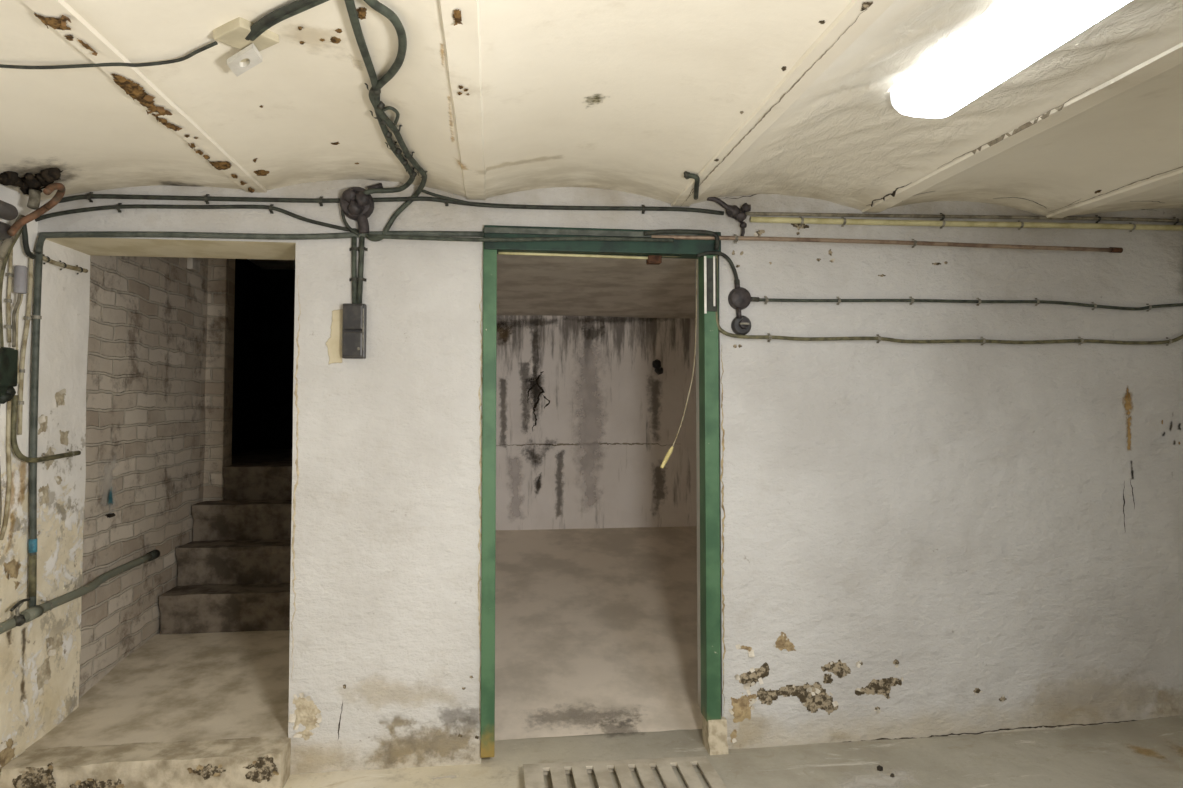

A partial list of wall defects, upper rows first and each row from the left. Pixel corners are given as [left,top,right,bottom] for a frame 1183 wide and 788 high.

spalling [111,74,269,193]
peeling [38,415,69,506]
corrosion [1124,388,1134,479]
flaking render [720,344,863,743]
flaking render [3,557,24,590]
peeling [35,631,63,690]
flaking render [855,659,904,714]
peeling [0,738,18,772]
spalling [12,762,125,788]
spalling [187,764,226,780]
spalling [243,755,279,783]
leakage [378,718,471,764]